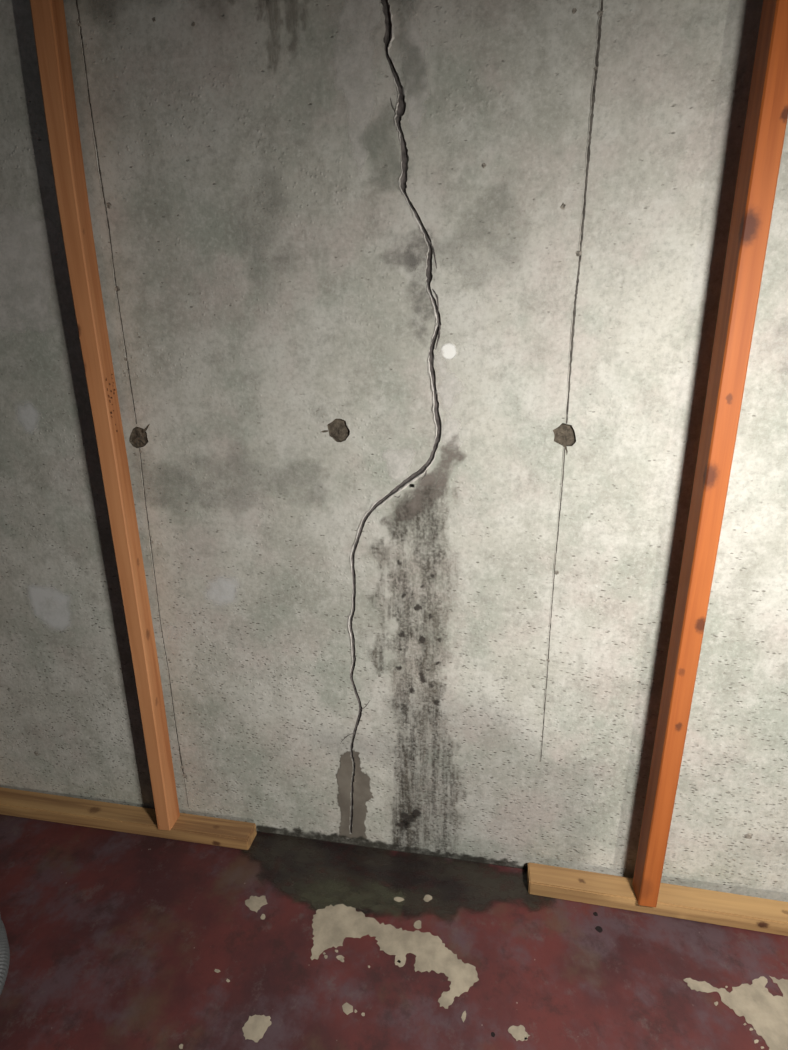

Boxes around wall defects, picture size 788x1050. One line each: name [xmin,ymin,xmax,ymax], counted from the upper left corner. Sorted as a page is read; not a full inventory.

water stain [334,0,381,165]
water stain [404,17,427,129]
crack [341,0,442,833]
water stain [242,352,554,919]
peeling [310,904,479,1009]
peeling [684,976,788,1050]